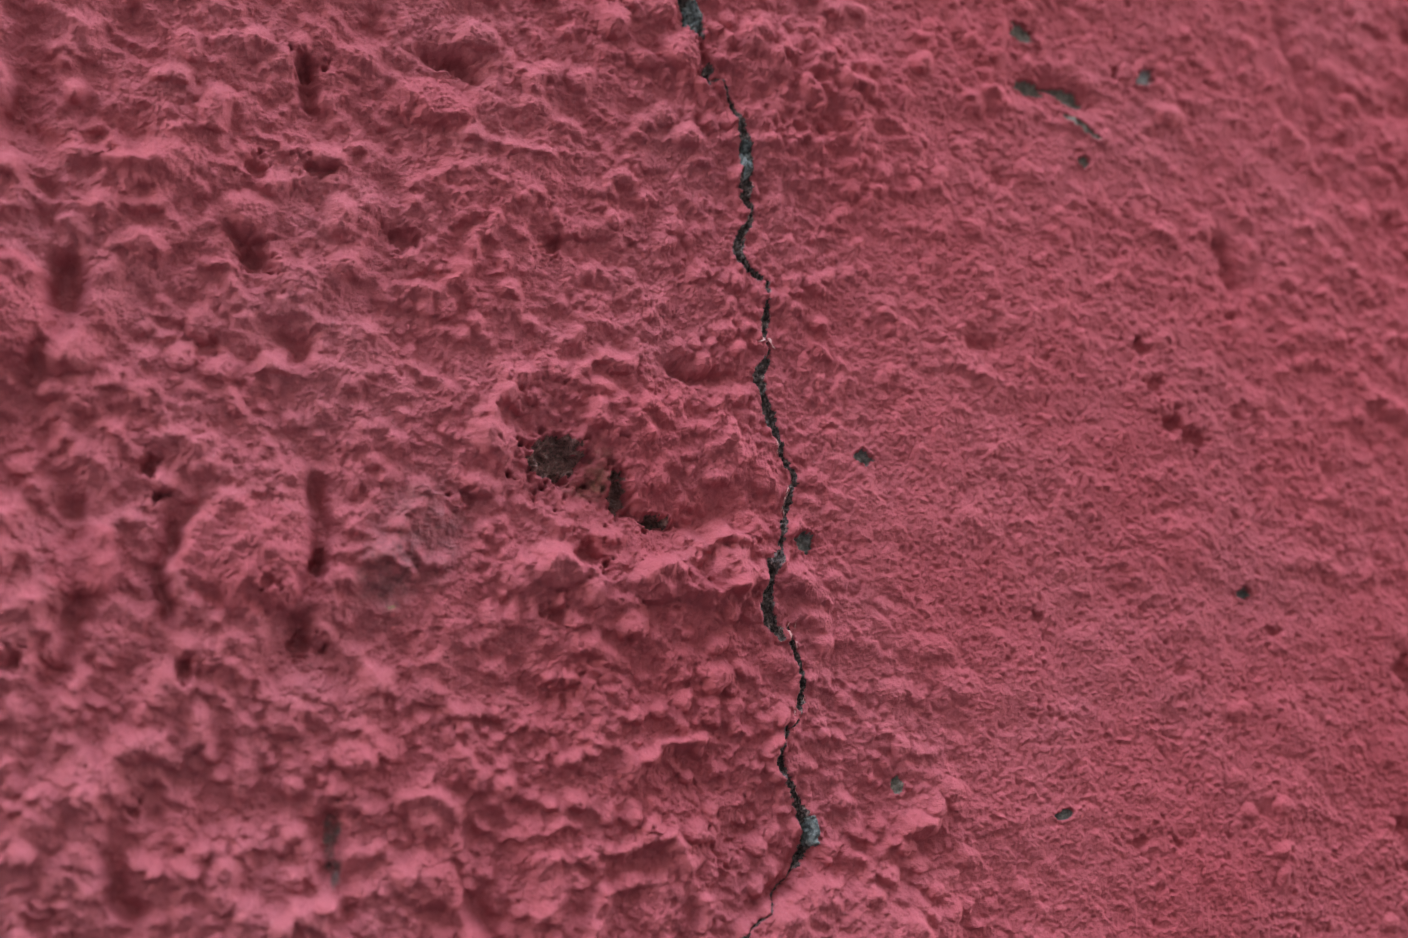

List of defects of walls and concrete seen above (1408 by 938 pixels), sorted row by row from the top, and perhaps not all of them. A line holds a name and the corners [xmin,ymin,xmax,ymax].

crack [677,0,820,938]